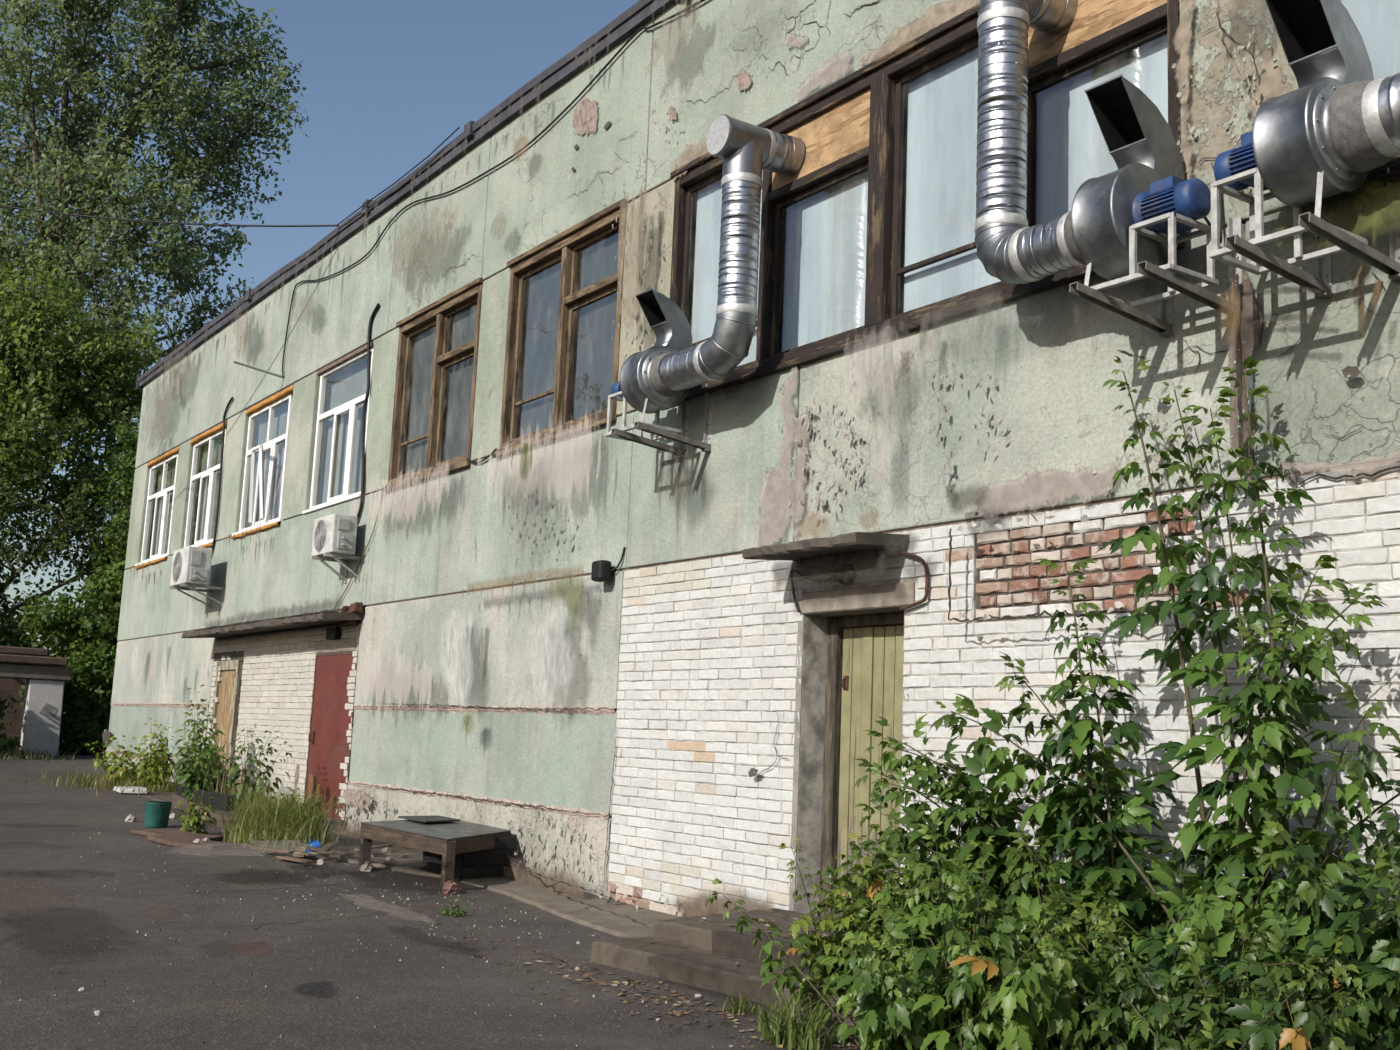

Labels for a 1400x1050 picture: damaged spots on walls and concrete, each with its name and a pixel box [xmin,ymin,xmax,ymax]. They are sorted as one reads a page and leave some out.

spalling [572,97,611,150]
crack [679,0,882,104]
peeling [1224,30,1293,148]
water stain [511,443,532,477]
peeling [755,367,861,548]
crack [1285,424,1400,485]
flaking render [945,462,1251,622]
water stain [443,612,473,735]
water stain [531,577,582,701]